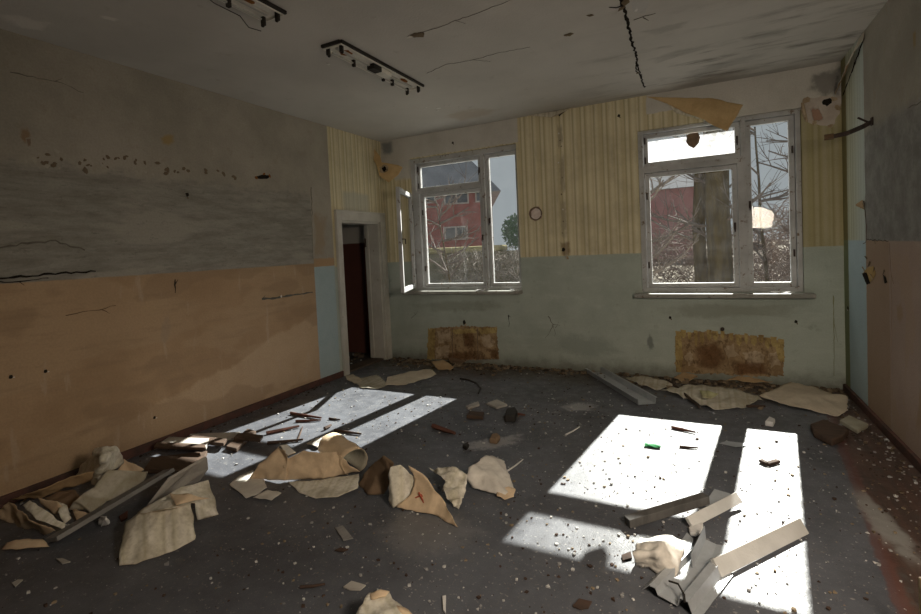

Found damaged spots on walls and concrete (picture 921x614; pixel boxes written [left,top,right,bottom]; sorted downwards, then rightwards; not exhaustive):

peeling [801,96,841,128]
crack [262,292,313,300]